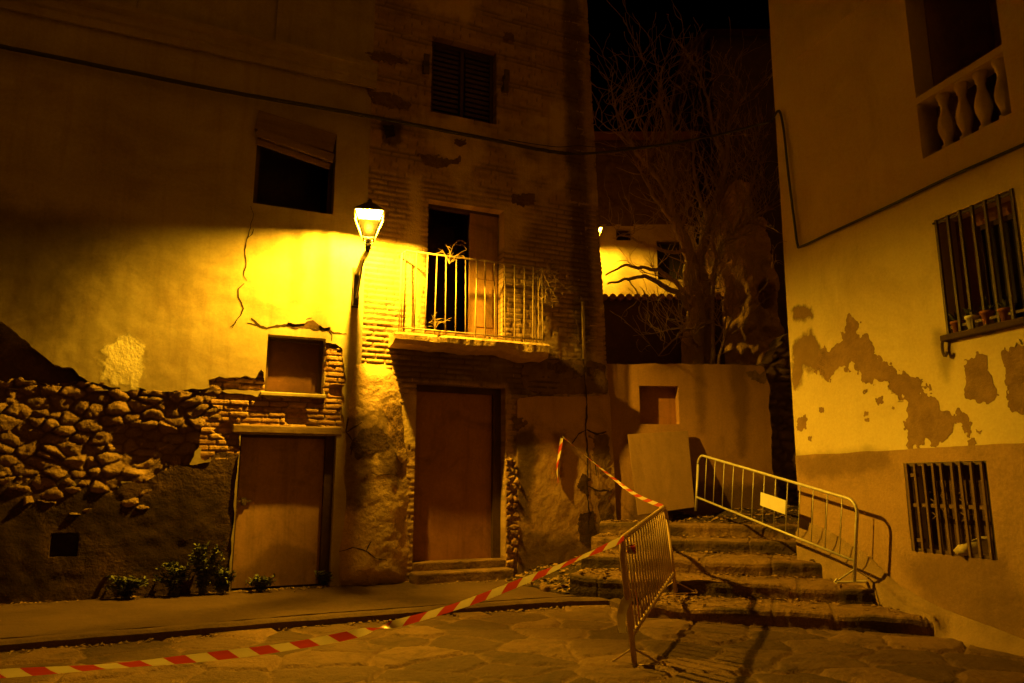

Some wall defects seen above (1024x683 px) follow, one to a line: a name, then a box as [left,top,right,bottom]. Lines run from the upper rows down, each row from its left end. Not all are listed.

crack [230,208,347,341]
flaking render [0,319,346,510]
peeling [792,313,1024,449]